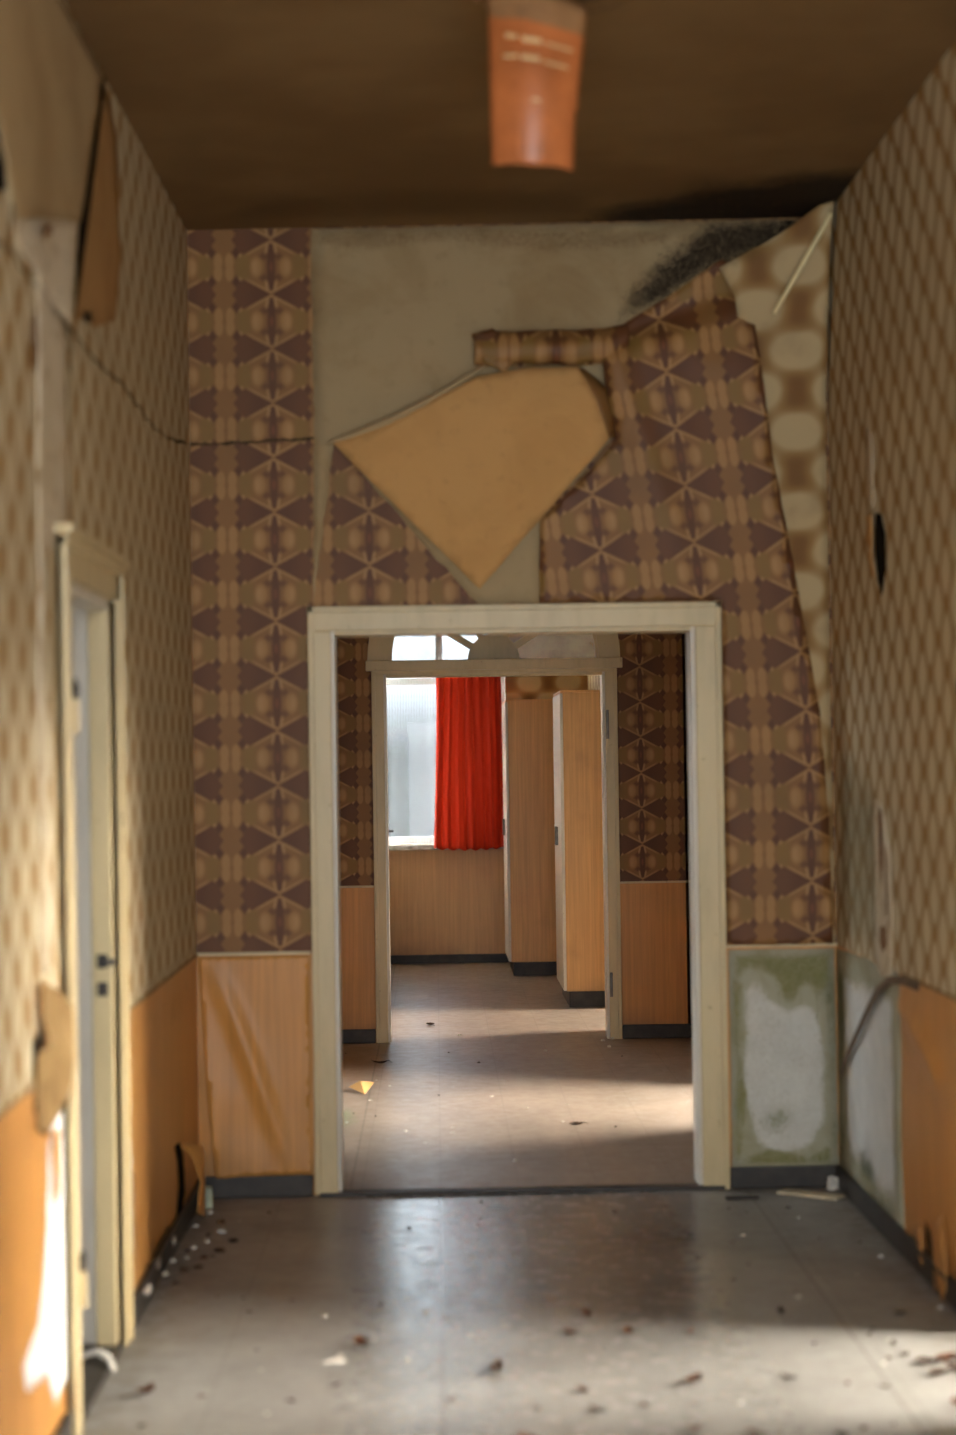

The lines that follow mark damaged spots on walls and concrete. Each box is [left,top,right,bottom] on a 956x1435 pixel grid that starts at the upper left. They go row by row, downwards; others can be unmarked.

flaking render [30,88,120,974]
flaking render [311,219,800,604]
flaking render [24,1111,66,1407]
leakage [732,952,877,1190]